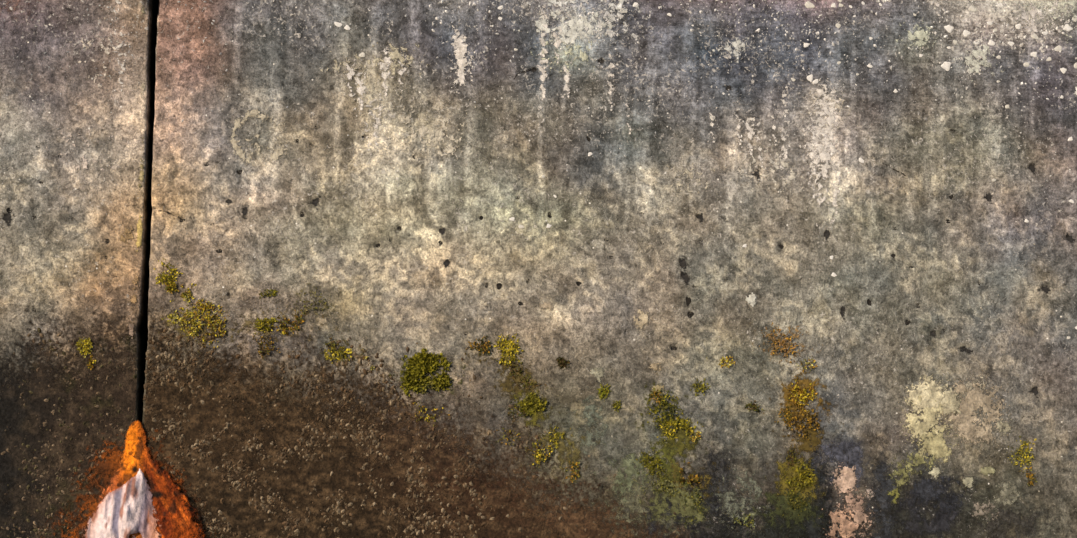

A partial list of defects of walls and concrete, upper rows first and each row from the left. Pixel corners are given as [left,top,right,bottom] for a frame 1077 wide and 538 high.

water stain [320,38,480,173]
water stain [449,20,474,93]
water stain [518,0,651,137]
water stain [712,30,754,62]
water stain [725,79,859,230]
rust [50,421,205,538]
water stain [0,301,971,538]